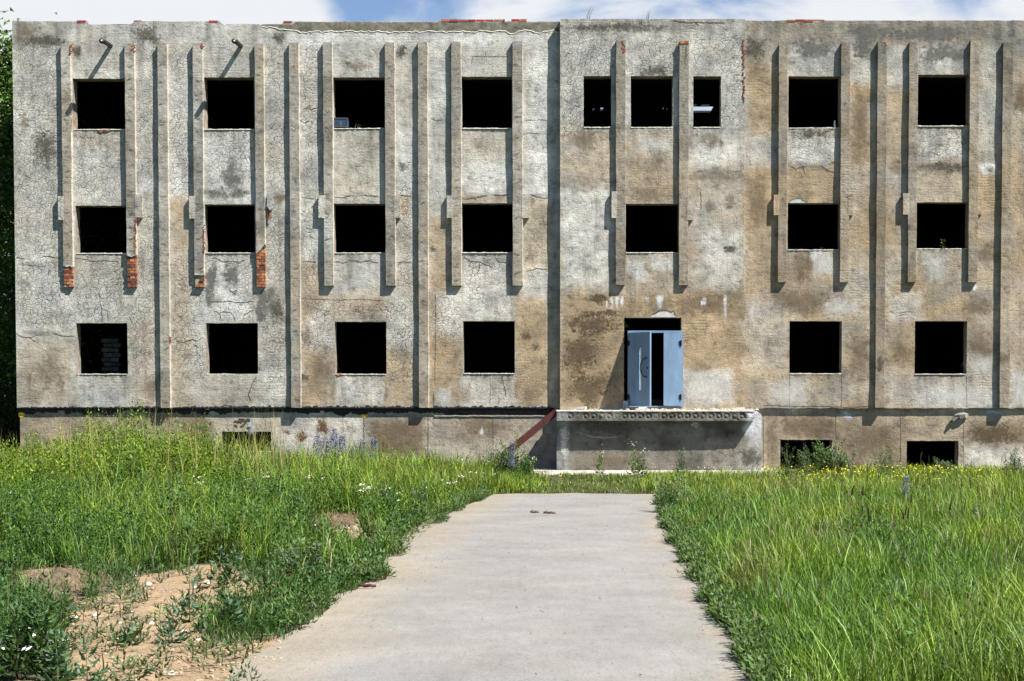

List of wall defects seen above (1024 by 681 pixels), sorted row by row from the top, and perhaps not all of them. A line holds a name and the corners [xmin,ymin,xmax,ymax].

leakage [745,37,765,59]
leakage [795,38,829,60]
leakage [793,128,833,138]
crack [18,20,739,455]
spalling [127,215,143,287]
spalling [63,265,74,287]
spalling [256,244,266,287]
corrosion [287,419,327,441]